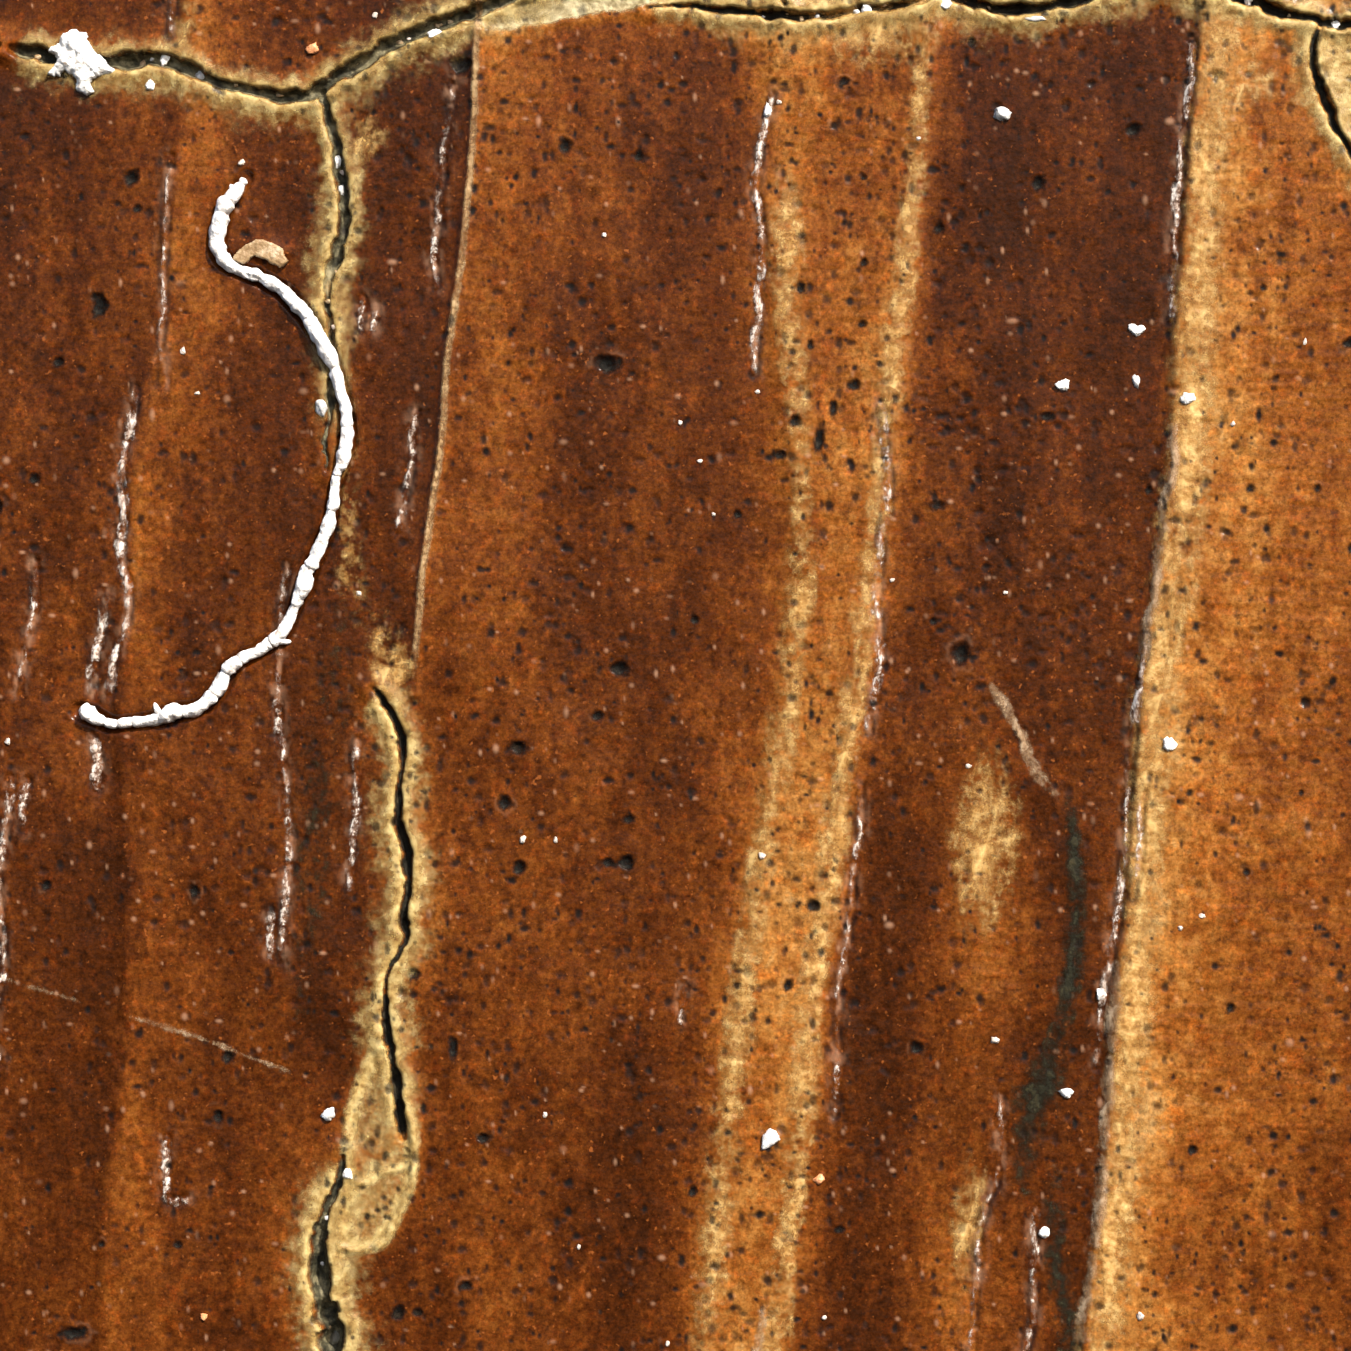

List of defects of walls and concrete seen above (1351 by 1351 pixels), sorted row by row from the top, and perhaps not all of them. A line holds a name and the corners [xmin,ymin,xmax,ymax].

crack [16,0,1132,649]
crack [1183,0,1351,163]
crack [297,689,429,1351]